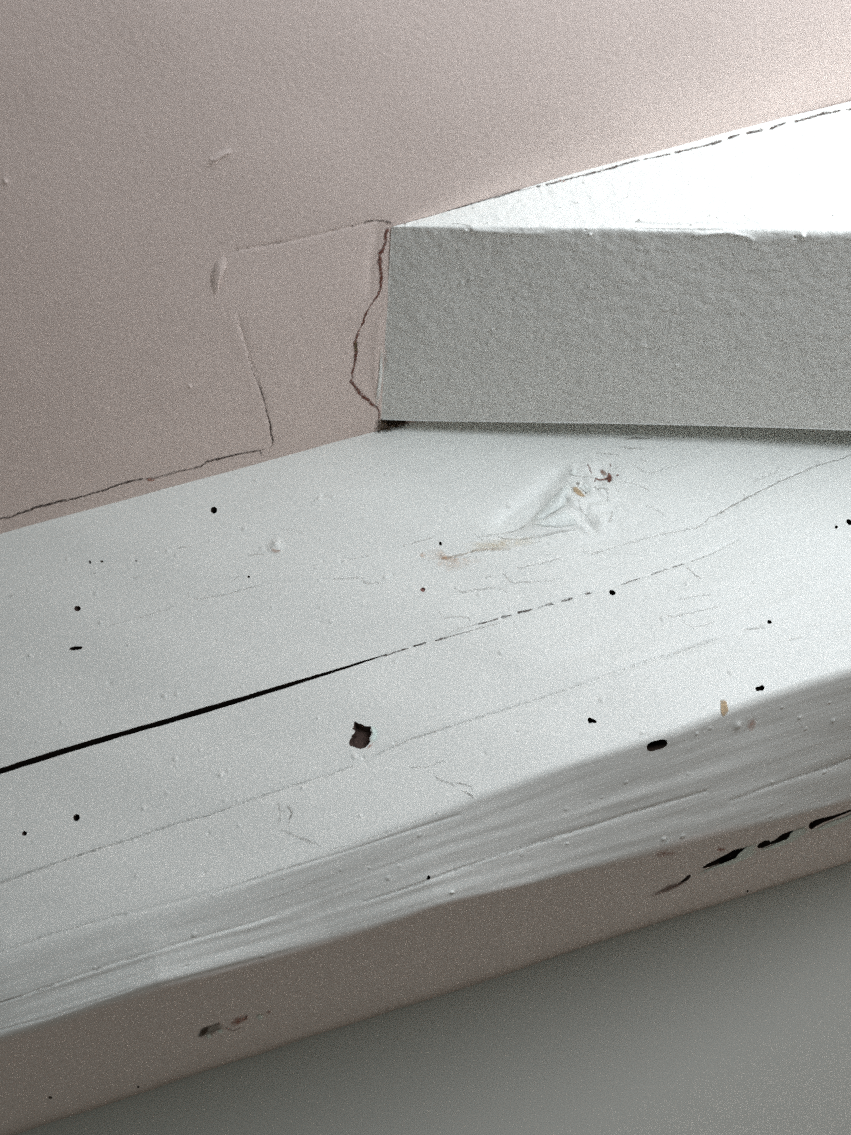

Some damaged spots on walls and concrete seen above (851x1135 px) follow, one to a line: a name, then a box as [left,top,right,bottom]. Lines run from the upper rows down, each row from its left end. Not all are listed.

crack [448,108,851,211]
crack [350,220,406,418]
crack [479,593,591,624]
spalling [349,721,377,749]
spalling [656,810,851,894]